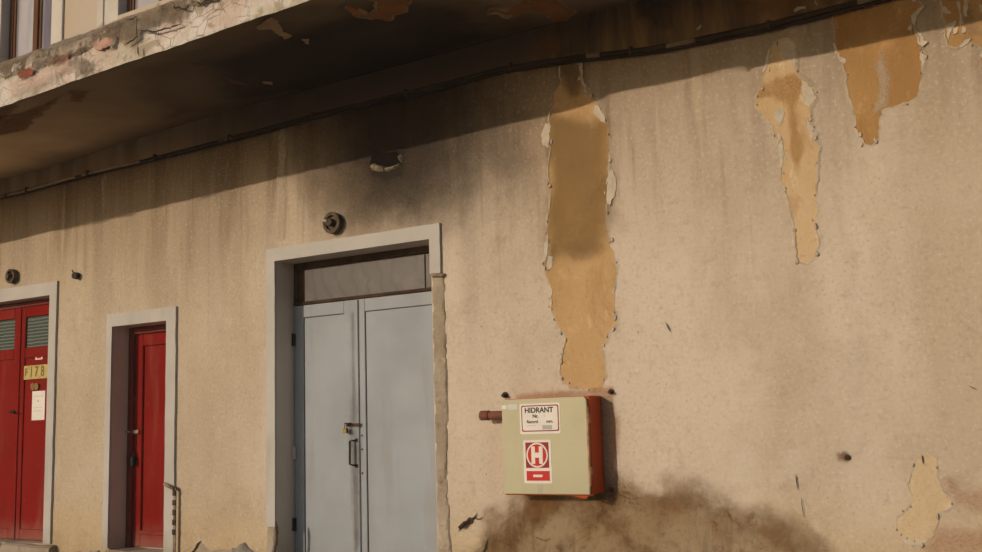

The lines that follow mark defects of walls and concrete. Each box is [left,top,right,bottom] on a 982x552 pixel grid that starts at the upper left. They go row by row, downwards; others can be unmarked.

spalling [3,21,126,83]
crack [124,0,210,55]
spalling [161,0,216,11]
spalling [341,0,414,21]
flaking render [829,0,982,147]
leakage [0,99,58,135]
flaking render [751,25,825,266]
flaking render [541,62,620,392]
leakage [485,482,818,552]
flaking render [895,452,956,548]